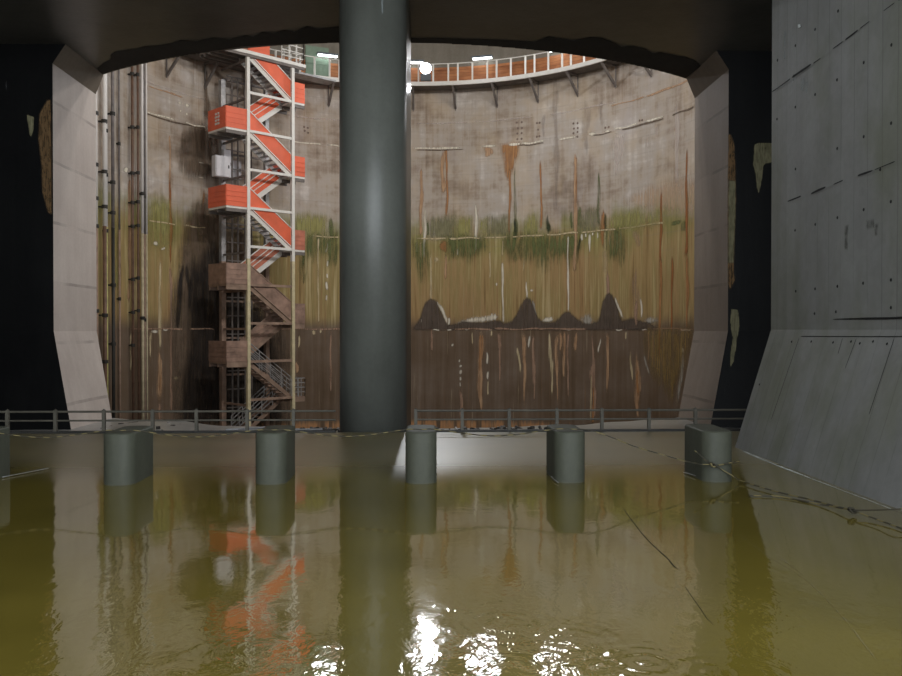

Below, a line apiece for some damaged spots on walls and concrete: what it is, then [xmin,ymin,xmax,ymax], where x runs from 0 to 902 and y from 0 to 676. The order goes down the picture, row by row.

crack [772,3,894,92]
water stain [180,71,219,179]
rust [485,144,519,232]
crack [787,161,895,202]
water stain [149,197,299,423]
water stain [312,238,332,390]